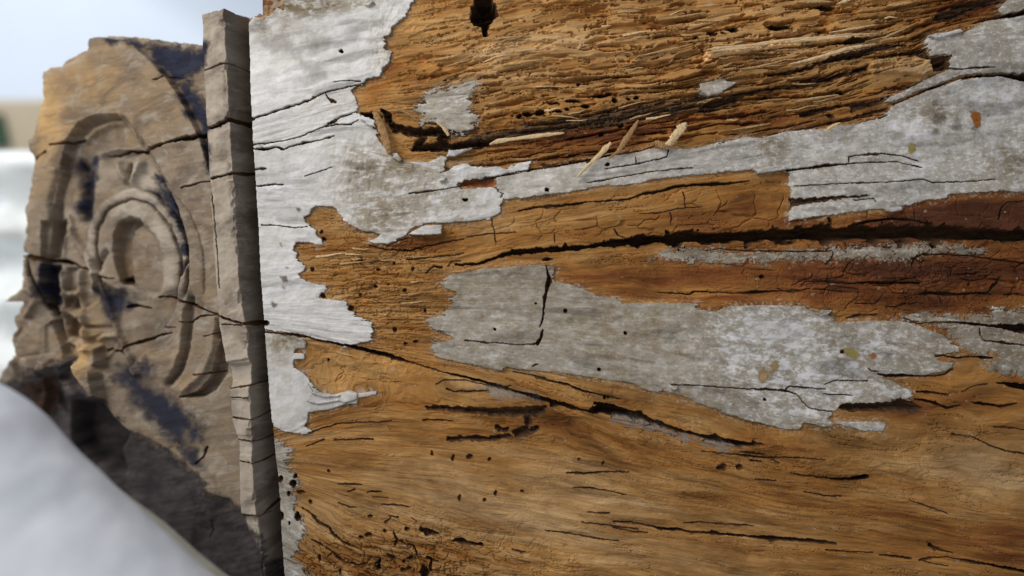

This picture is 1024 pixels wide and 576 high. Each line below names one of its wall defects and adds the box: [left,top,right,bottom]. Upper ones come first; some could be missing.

crack [37,141,86,159]
crack [108,80,366,287]
crack [25,146,1024,497]
peeling [249,0,1024,576]